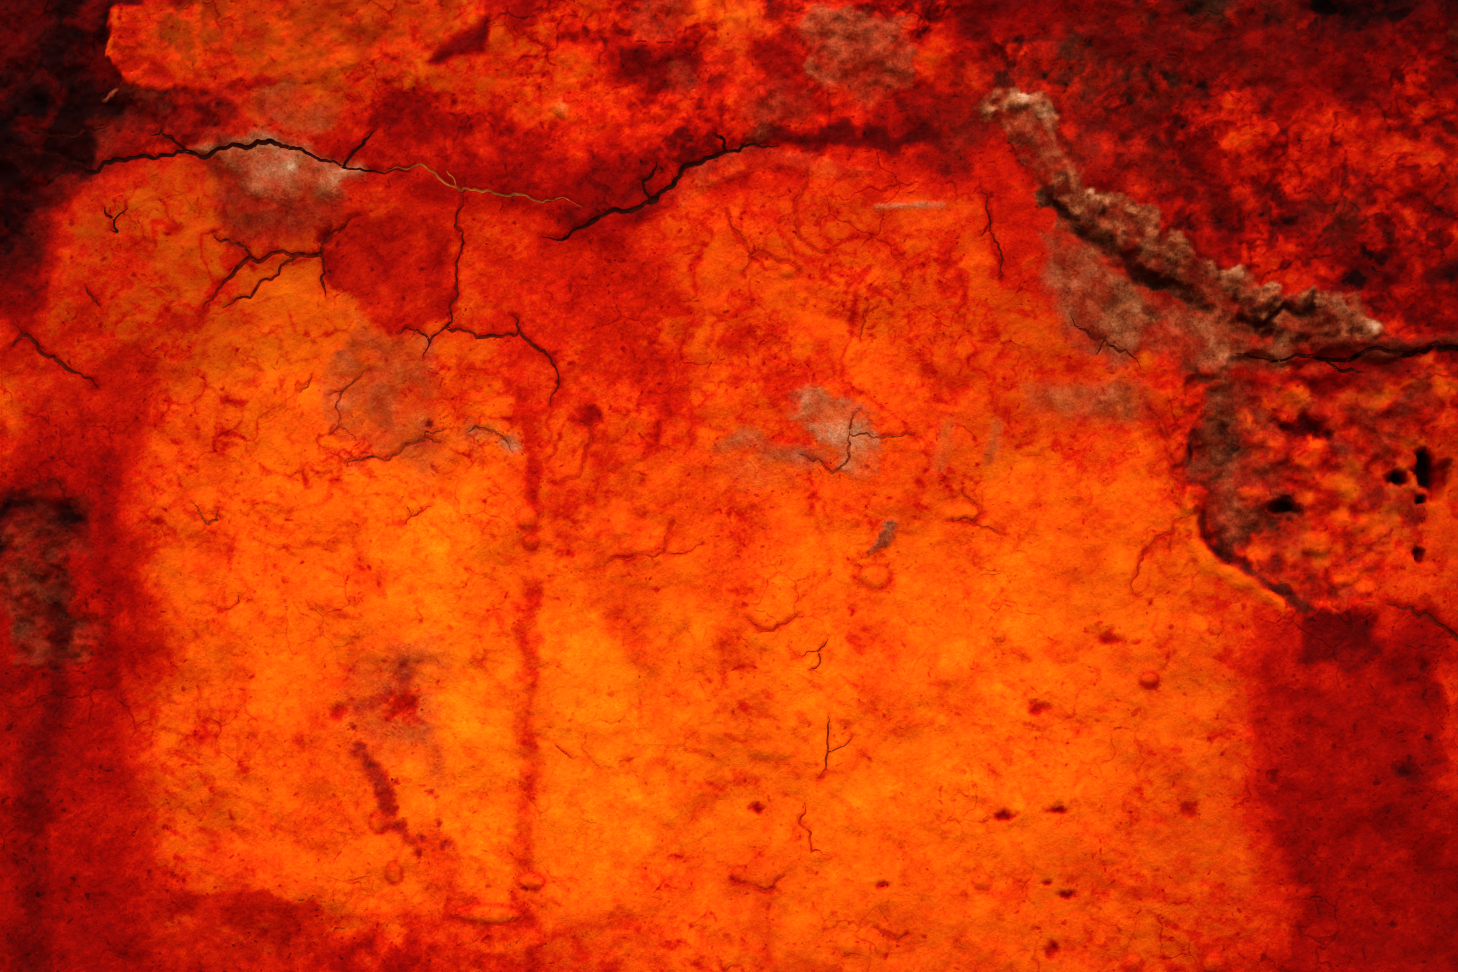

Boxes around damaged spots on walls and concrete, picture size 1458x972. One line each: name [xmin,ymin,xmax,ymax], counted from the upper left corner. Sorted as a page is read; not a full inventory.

crack [10,126,775,485]
crack [727,169,826,278]
spalling [1164,343,1458,638]
crack [1236,340,1458,373]